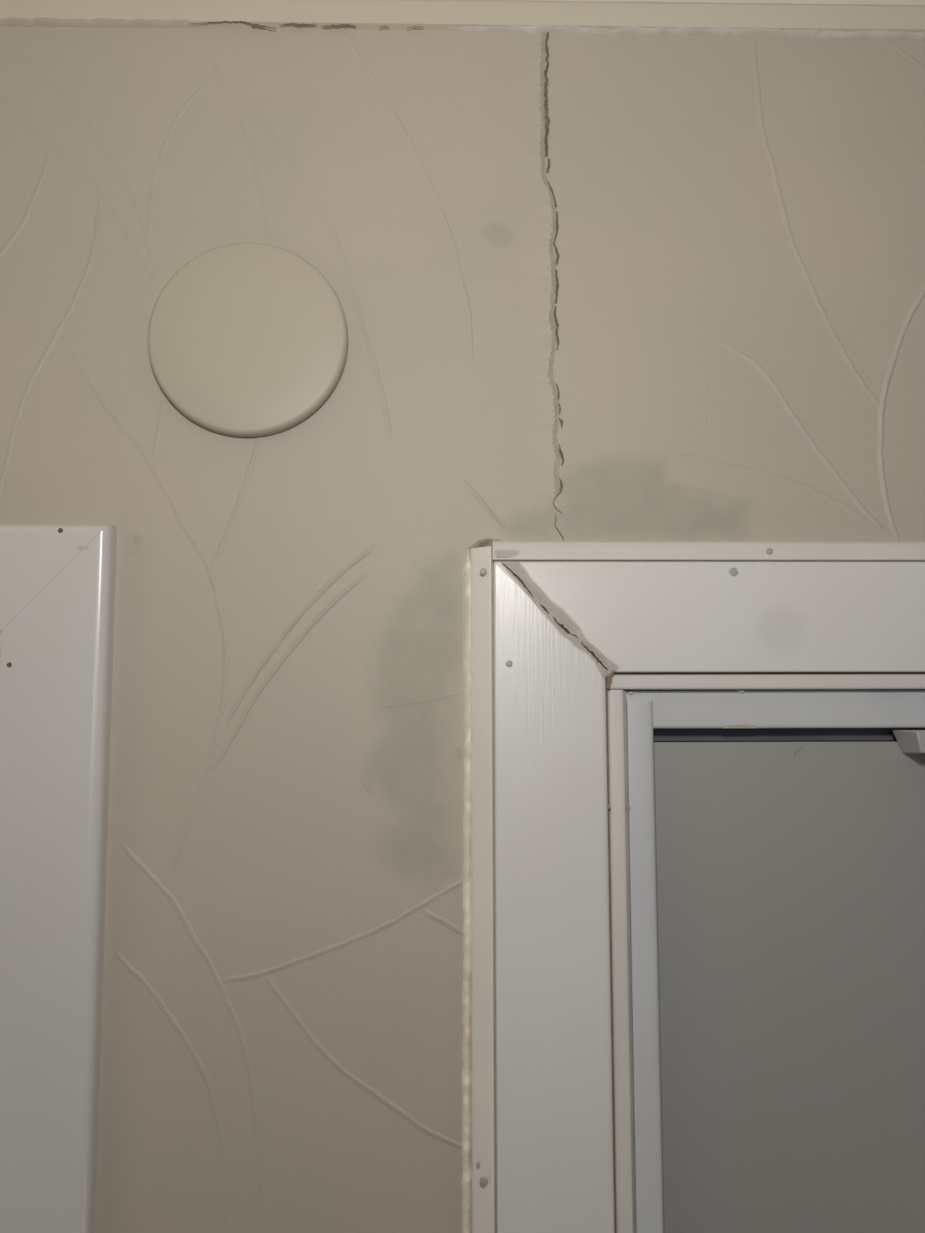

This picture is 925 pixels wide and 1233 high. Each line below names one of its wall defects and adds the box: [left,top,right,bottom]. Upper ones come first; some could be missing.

crack [189,21,420,29]
crack [513,32,564,540]